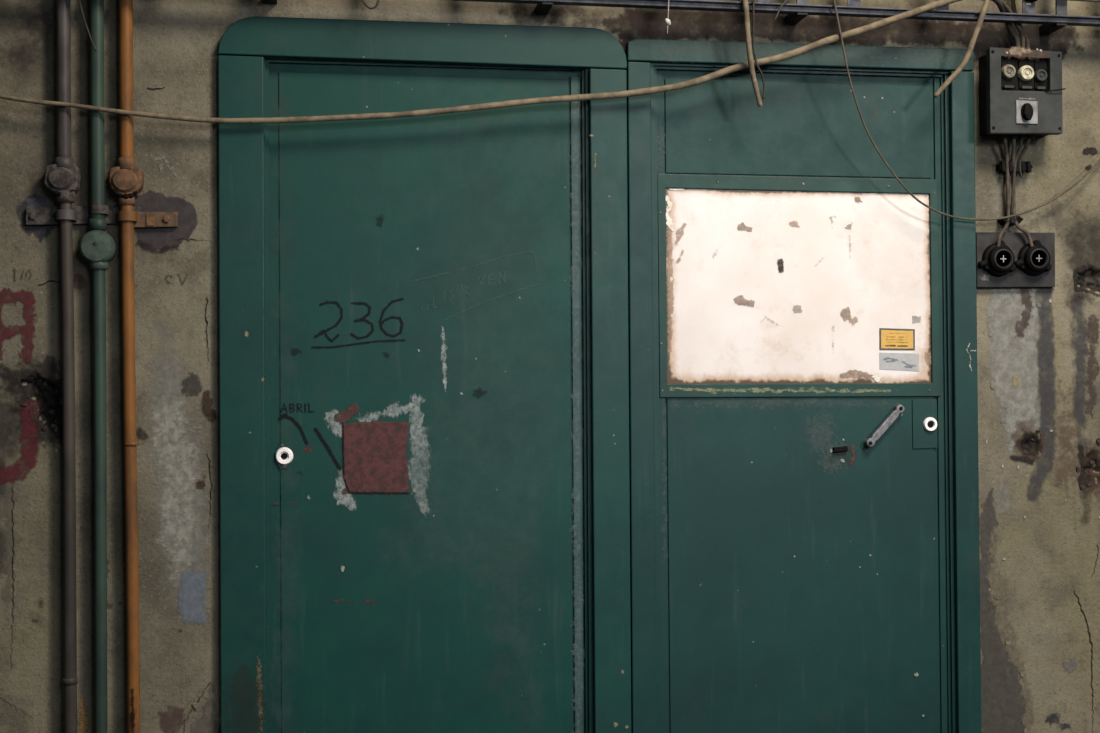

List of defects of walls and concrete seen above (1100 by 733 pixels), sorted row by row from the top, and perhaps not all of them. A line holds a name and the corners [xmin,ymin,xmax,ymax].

water stain [1028,287,1055,500]
water stain [1072,294,1100,427]
spalling [1073,264,1100,297]
crack [1074,545,1099,732]